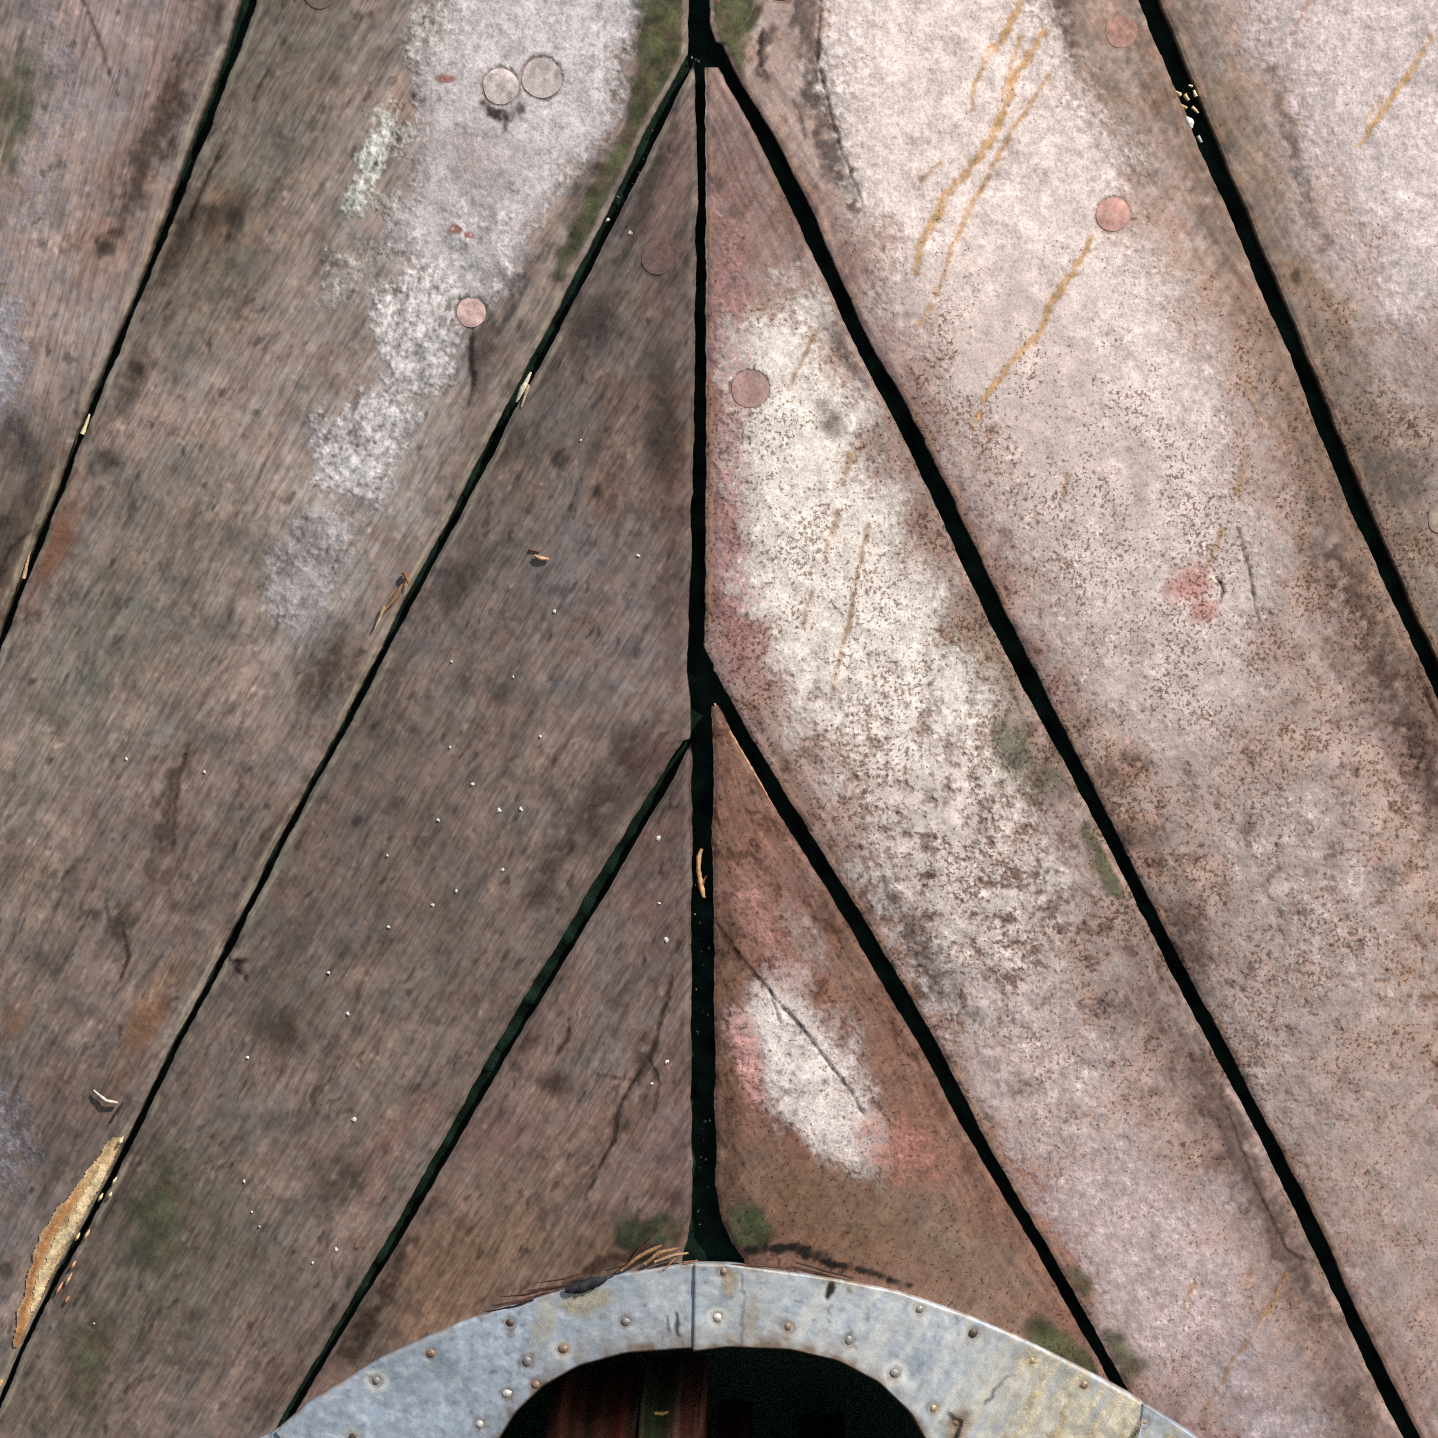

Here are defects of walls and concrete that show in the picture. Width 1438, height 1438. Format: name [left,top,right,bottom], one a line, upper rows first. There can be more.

leakage [449,224,474,238]
leakage [481,100,525,127]
corrosion [914,1,1050,324]
corrosion [1358,34,1433,146]
corrosion [973,236,1093,430]
crack [586,983,671,1194]
crack [720,930,863,1112]
peeling [31,1164,108,1311]